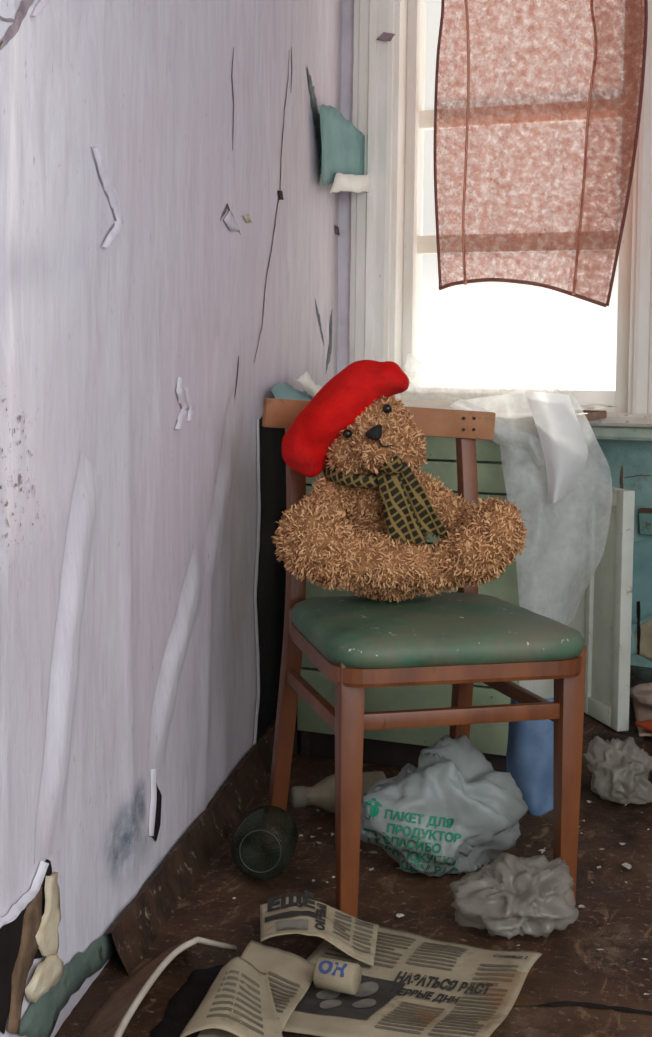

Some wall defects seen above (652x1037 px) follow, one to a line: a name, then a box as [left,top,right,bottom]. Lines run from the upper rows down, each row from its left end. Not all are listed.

crack [0,0,49,50]
peeling [631,540,652,661]
peeling [19,872,116,1037]